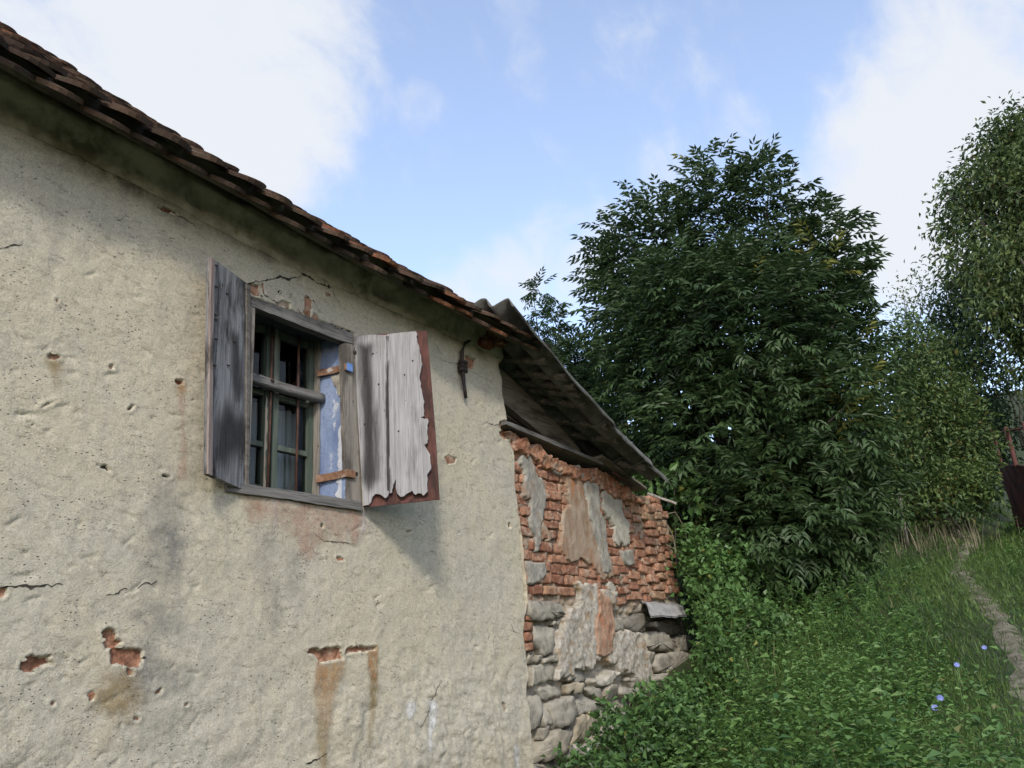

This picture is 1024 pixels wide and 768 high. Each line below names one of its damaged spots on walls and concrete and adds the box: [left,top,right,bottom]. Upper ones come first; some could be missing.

crack [248,273,350,332]
crack [0,582,63,590]
spalling [20,655,49,673]
spalling [98,629,146,675]
corrosion [369,647,378,707]